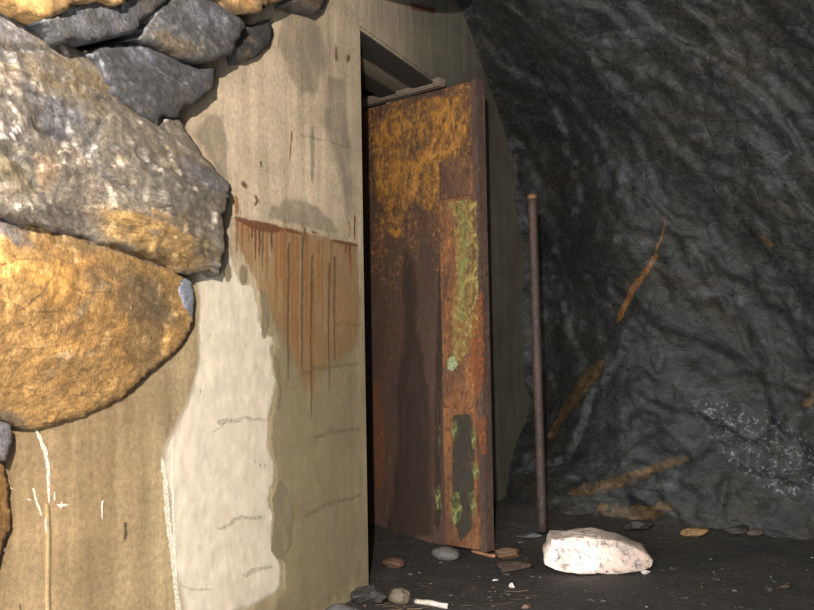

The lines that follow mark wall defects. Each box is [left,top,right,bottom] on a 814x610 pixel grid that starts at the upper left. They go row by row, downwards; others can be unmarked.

corrosion [375,97,466,237]